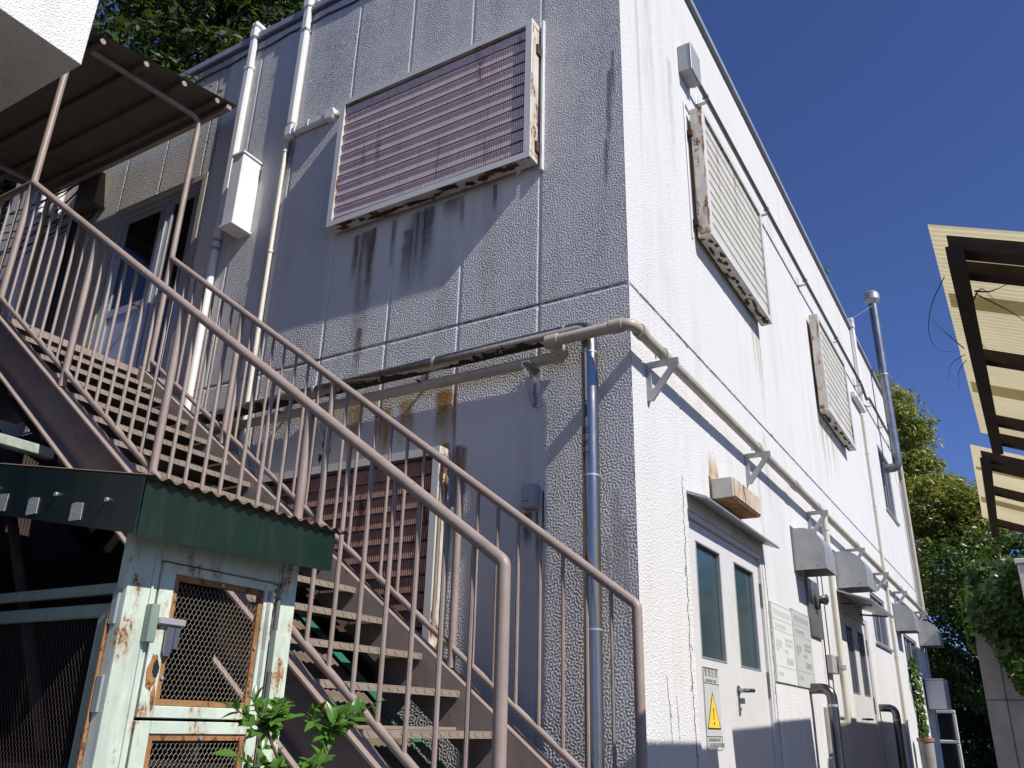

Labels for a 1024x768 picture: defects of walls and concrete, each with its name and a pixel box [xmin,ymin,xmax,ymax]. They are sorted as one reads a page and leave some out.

rust [334,163,519,269]
rust [693,114,769,324]
rust [439,391,456,422]
rust [816,379,851,450]
crack [667,476,700,759]